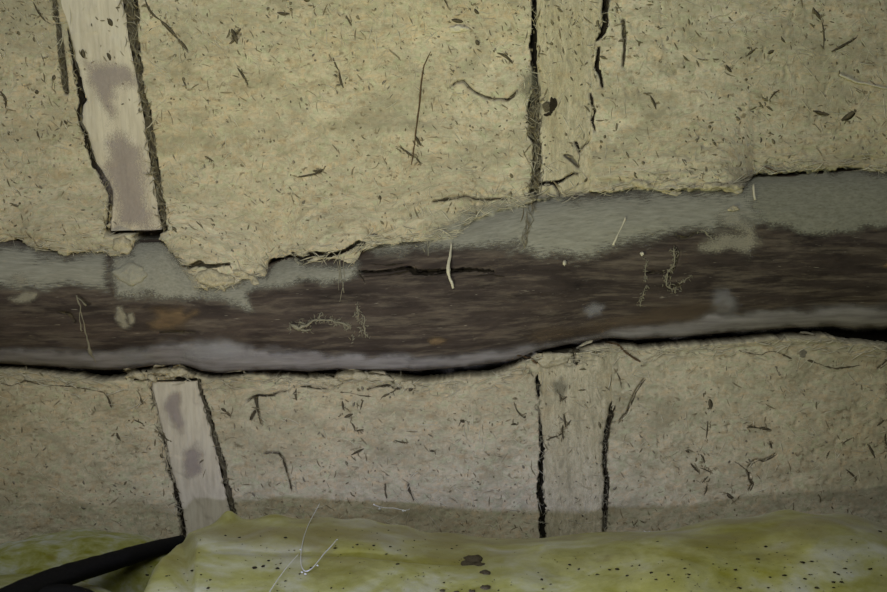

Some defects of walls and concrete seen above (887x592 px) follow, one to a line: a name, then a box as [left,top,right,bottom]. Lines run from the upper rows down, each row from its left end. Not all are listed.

peeling [145,0,188,53]
peeling [813,9,857,52]
crack [67,29,114,230]
crack [433,0,627,251]
flaking render [632,180,745,196]
flaking render [178,258,267,292]
flaking render [292,242,365,264]
flaking render [537,350,574,368]
crack [527,368,548,537]
crack [599,380,645,530]